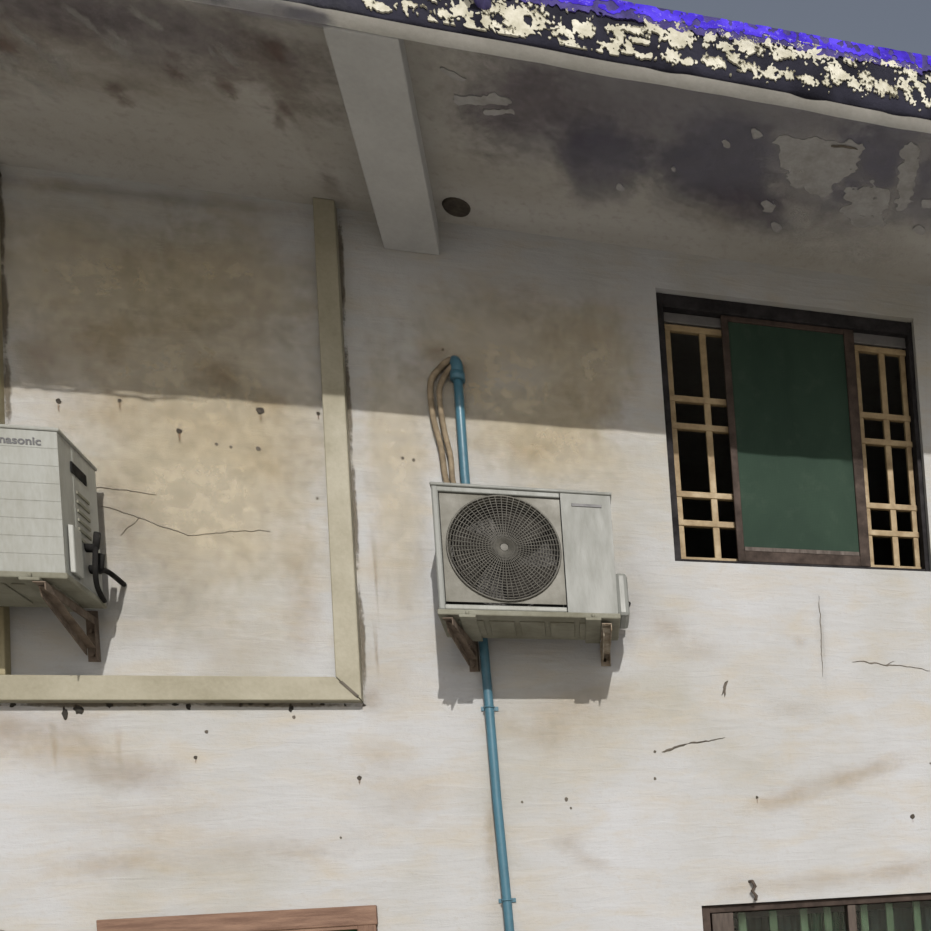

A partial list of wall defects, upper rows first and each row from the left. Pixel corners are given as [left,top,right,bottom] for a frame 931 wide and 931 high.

peeling [362,0,931,112]
peeling [454,92,515,116]
spalling [772,134,931,228]
crack [96,487,264,536]
crack [817,606,825,675]
crack [855,660,927,671]
crack [662,737,725,753]